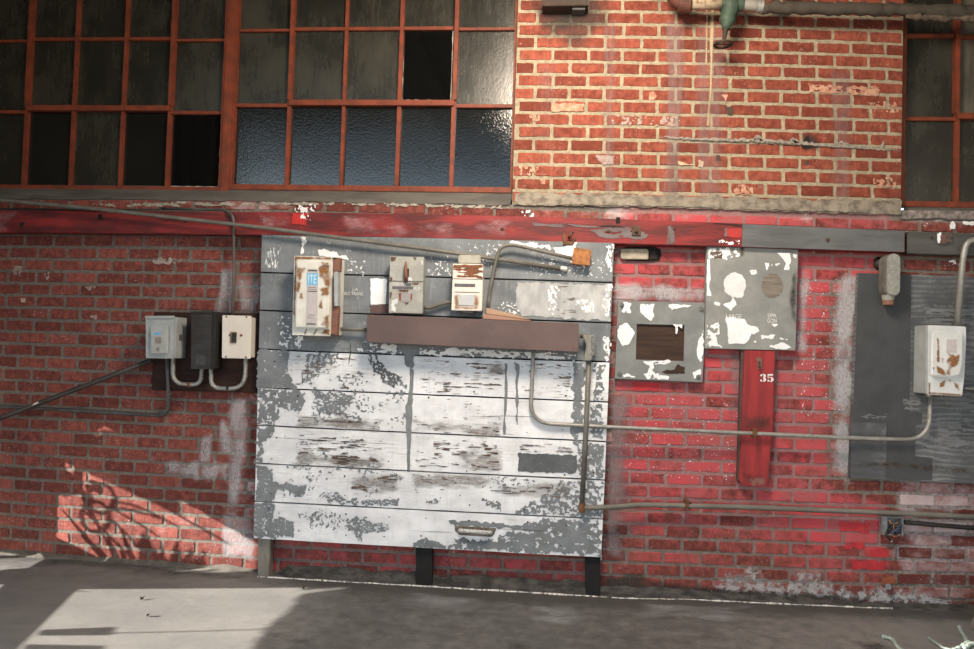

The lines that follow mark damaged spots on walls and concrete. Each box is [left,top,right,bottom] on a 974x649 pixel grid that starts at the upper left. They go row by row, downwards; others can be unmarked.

peeling [937,221,974,244]
spalling [100,165,902,560]
leakage [187,403,242,496]
leakage [606,575,673,589]
leakage [689,568,946,604]